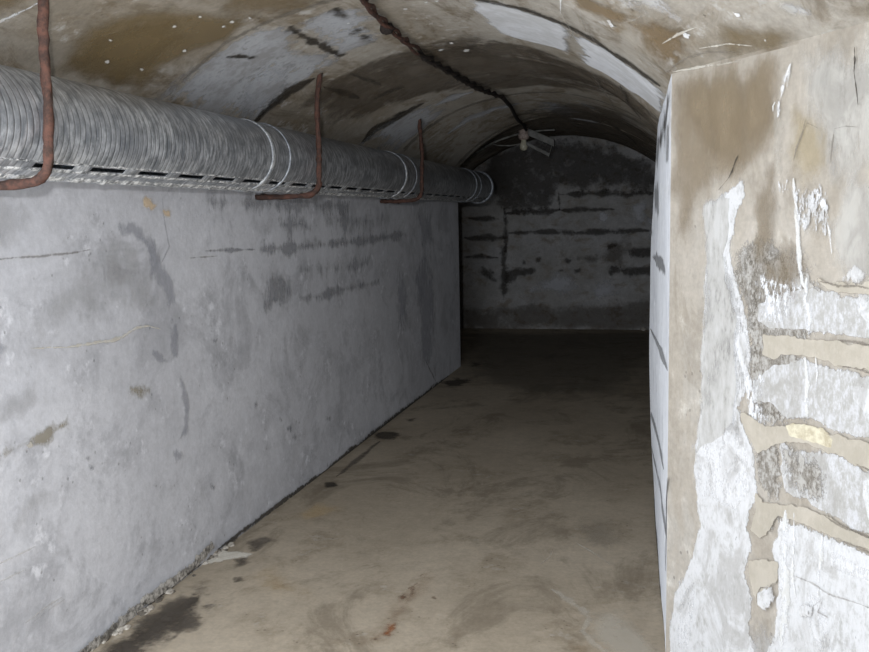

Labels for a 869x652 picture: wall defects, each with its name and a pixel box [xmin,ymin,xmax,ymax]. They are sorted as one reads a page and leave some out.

damp [70,0,306,88]
damp [288,26,345,57]
damp [0,39,668,255]
damp [680,64,791,186]
peeling [669,179,869,652]
damp [108,597,199,652]
spalling [79,540,236,652]